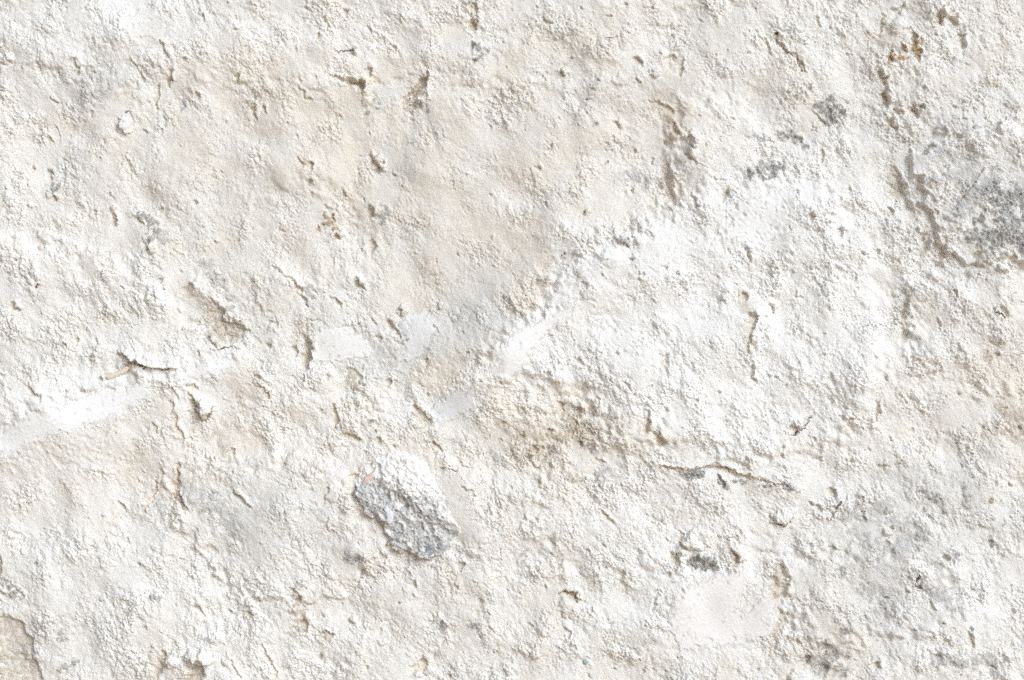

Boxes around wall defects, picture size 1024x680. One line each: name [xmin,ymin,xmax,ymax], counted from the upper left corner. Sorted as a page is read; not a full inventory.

crack [659,464,784,485]